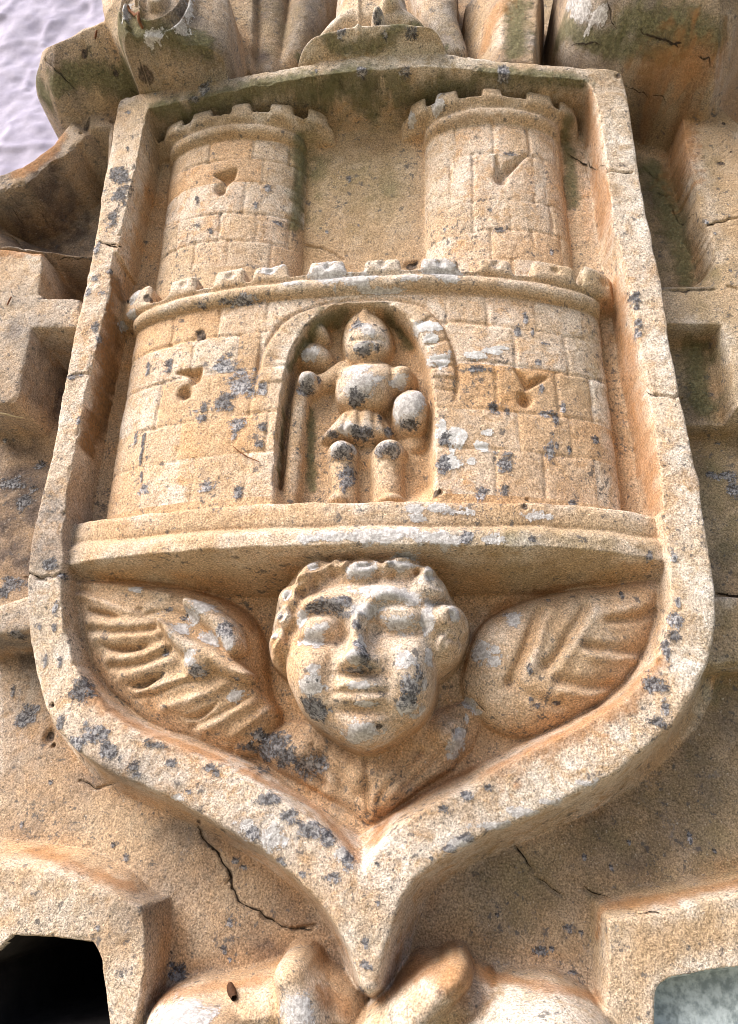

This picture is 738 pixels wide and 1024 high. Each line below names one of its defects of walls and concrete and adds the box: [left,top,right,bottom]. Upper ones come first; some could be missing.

crack [197,826,312,930]